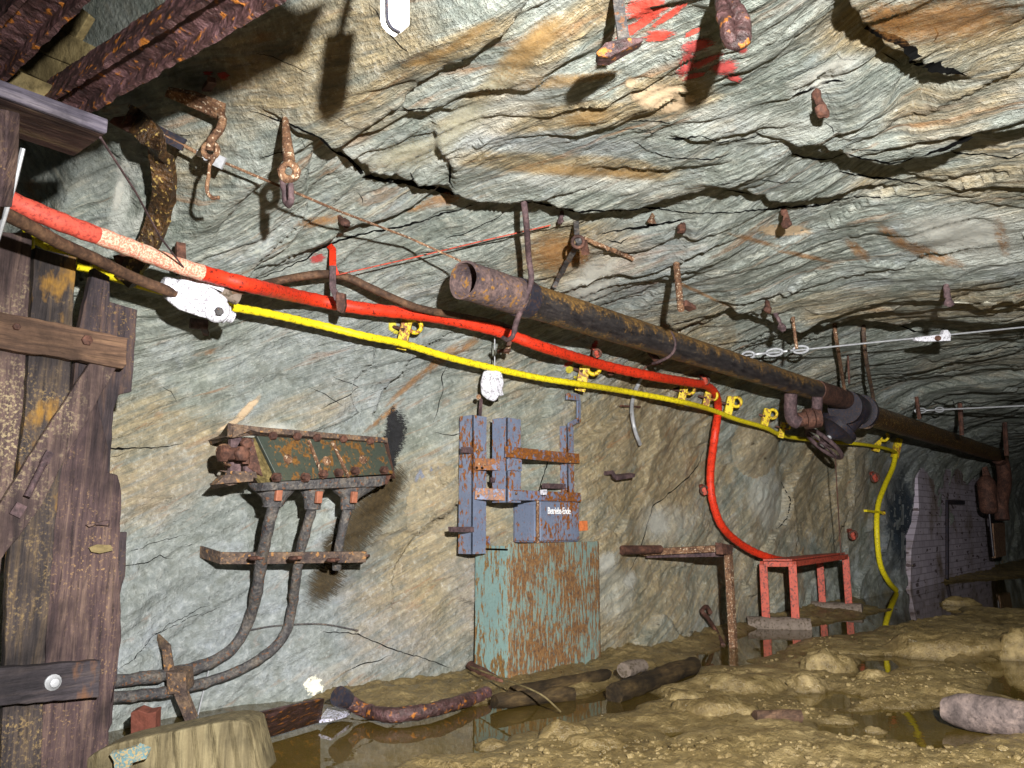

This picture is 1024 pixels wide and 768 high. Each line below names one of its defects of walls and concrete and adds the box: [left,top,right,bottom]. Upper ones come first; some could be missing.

crack [864,25,967,76]
water stain [887,472,915,566]